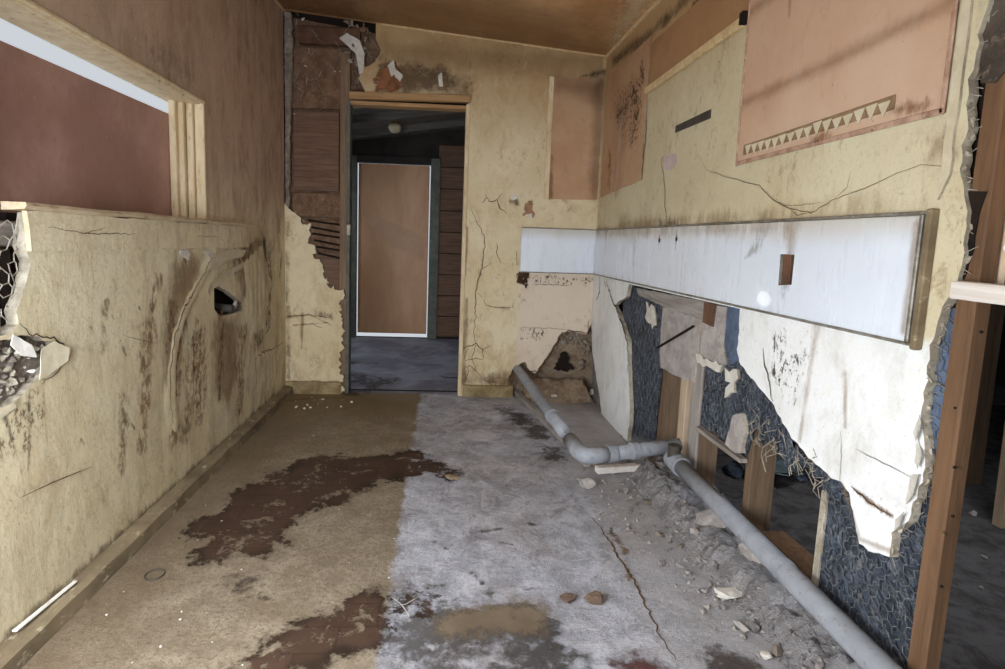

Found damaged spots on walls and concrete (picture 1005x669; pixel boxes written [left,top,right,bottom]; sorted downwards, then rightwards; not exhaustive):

flaking render [284,11,448,290]
flaking render [510,0,998,218]
crack [701,159,934,216]
flaking render [0,219,70,418]
leakage [120,274,162,457]
leakage [166,301,206,445]
leakage [179,449,465,567]
crack [464,195,629,379]
flaking render [508,322,601,408]
crack [592,518,676,659]
peeling [645,302,657,329]
flaking render [891,359,945,566]